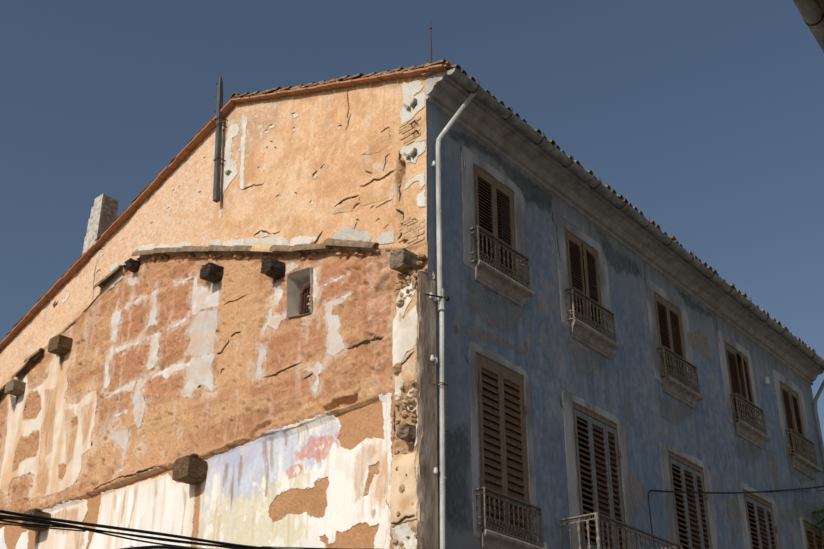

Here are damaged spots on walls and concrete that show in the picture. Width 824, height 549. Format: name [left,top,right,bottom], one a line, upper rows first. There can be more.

crack [344,90,352,130]
flaking render [398,117,427,146]
crack [334,124,416,240]
crack [224,293,247,305]
crack [217,329,241,374]
crack [263,361,313,379]
crack [347,332,386,349]
peeling [23,391,41,419]
peeling [12,431,39,471]
peeling [268,478,329,522]
peeling [320,523,379,549]
spalling [391,511,417,549]